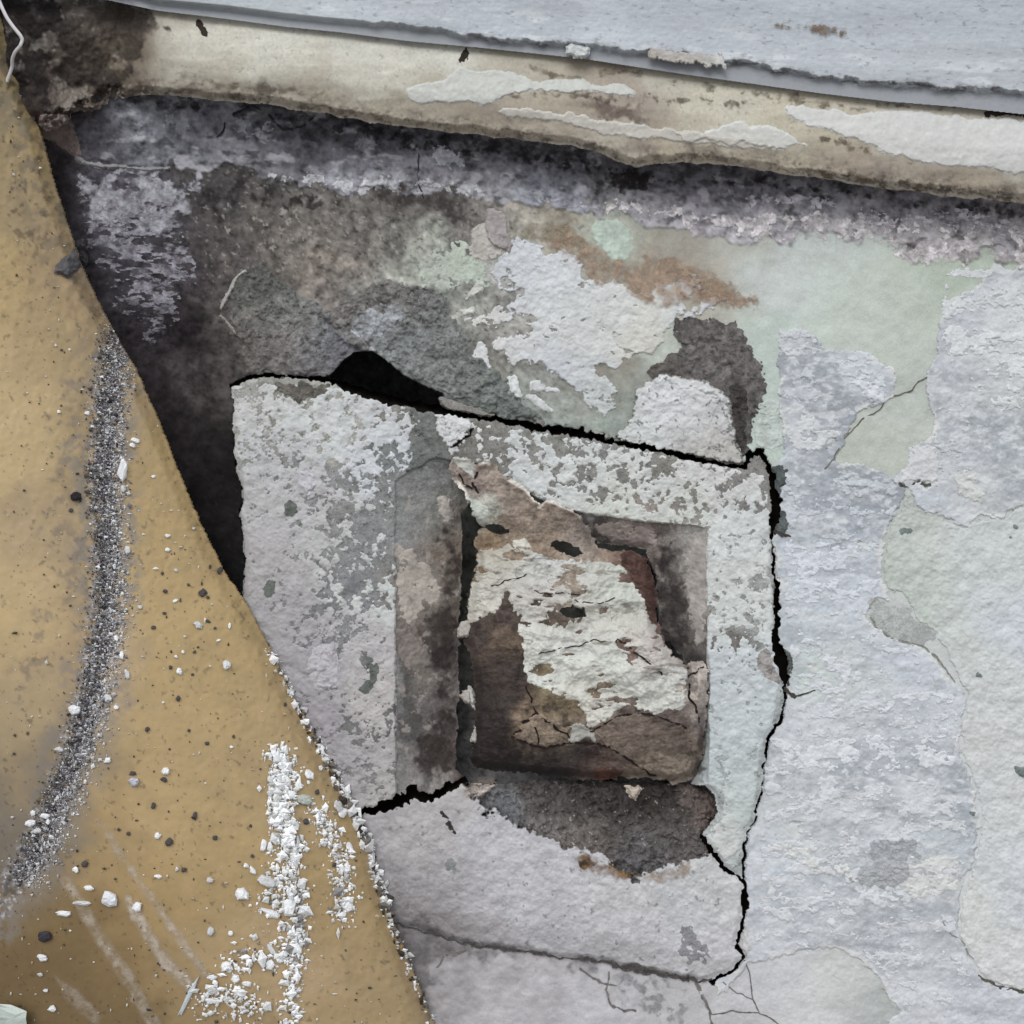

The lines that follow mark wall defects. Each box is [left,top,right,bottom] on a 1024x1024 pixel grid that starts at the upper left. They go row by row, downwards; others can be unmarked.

damp [158,97,209,132]
damp [233,106,293,138]
peeling [406,48,808,152]
peeling [784,104,1024,175]
damp [77,120,508,343]
damp [525,168,1024,268]
damp [437,528,462,596]
peeling [219,208,1024,1024]
damp [415,609,458,773]
crack [230,373,816,1024]